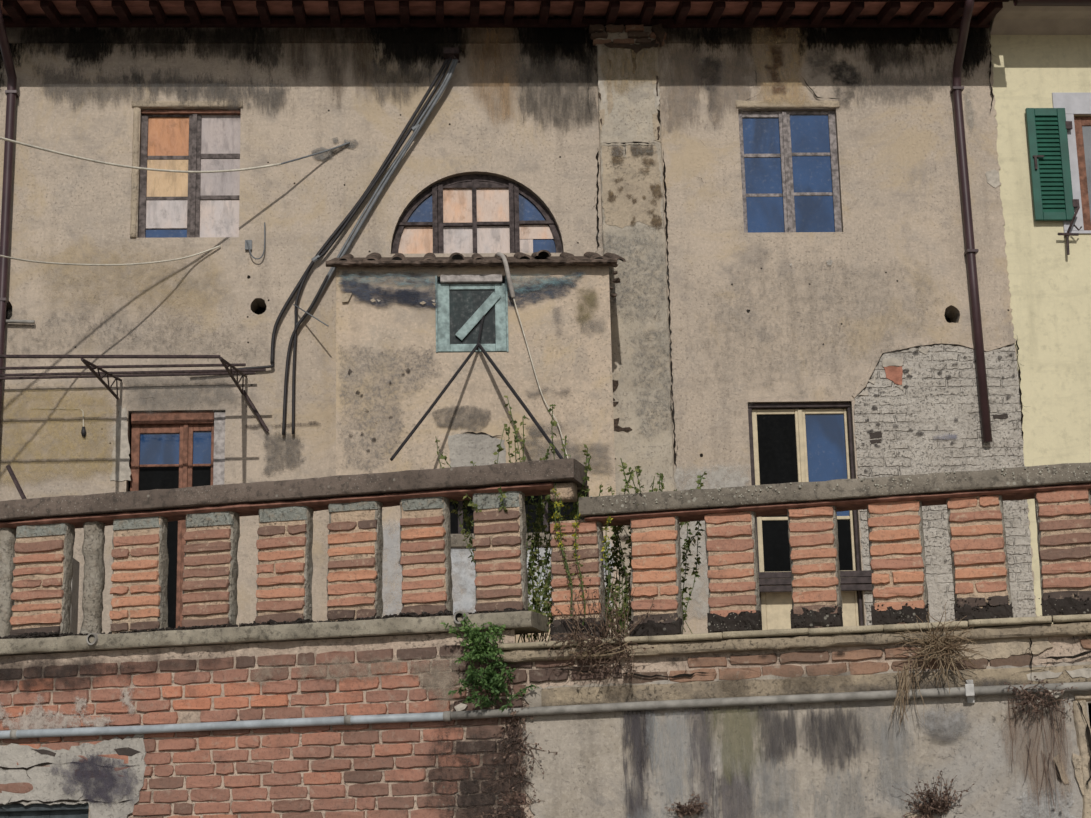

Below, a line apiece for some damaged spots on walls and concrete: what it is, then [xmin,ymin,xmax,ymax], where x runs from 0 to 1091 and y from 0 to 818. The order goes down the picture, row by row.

damp [0,27,340,108]
damp [351,16,653,127]
damp [669,17,952,102]
damp [340,271,438,307]
crack [592,142,678,467]
flaking render [852,338,1025,479]
flaking render [859,509,871,571]
flaking render [922,505,955,622]
flaking render [1003,499,1036,617]
flaking render [917,637,1053,661]
damp [622,706,796,818]
crack [1077,700,1091,789]